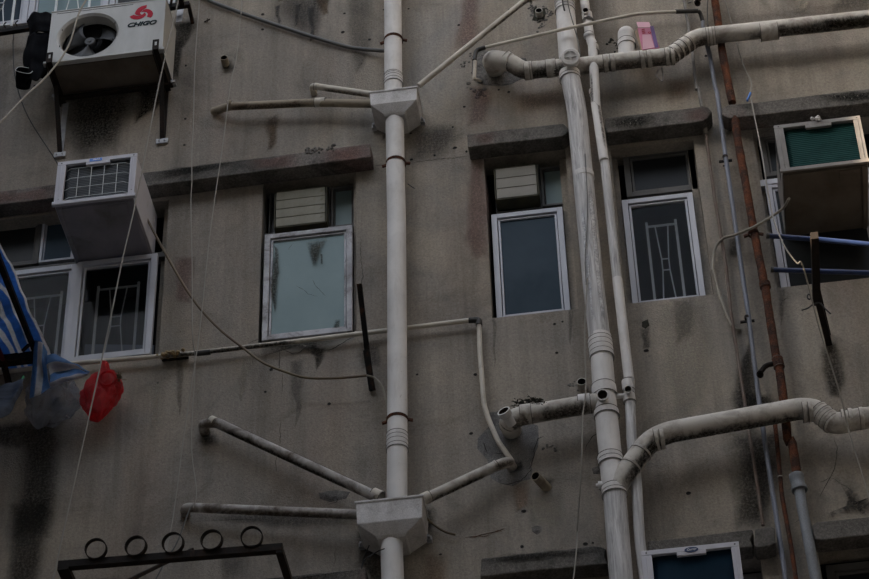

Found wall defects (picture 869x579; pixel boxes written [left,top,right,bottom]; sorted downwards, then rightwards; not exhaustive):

damp [823,344,843,395]
damp [0,425,56,579]